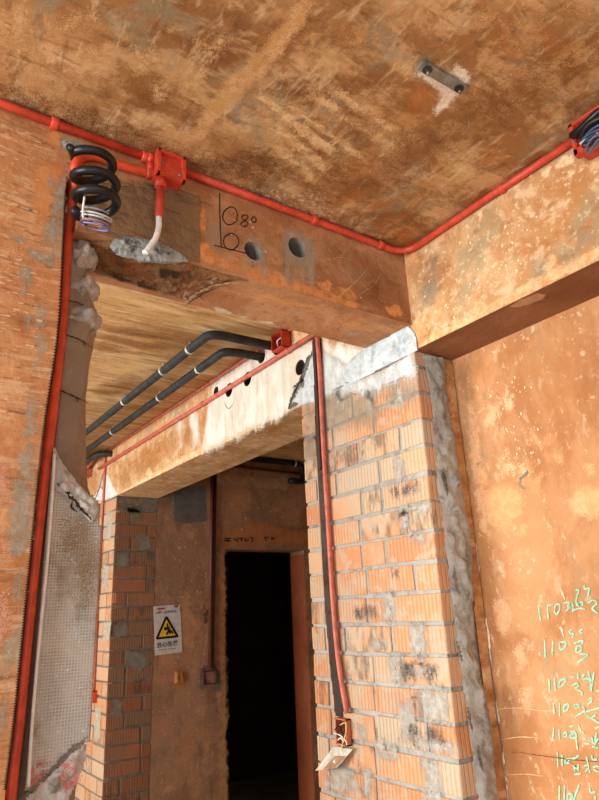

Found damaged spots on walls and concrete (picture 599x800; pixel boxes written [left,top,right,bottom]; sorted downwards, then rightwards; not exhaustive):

spalling [89,206,360,339]
crack [57,471,104,520]
leakage [390,478,421,500]
leakage [352,601,378,623]
leakage [396,659,446,689]
leakage [405,721,446,747]
flaking render [26,744,87,800]